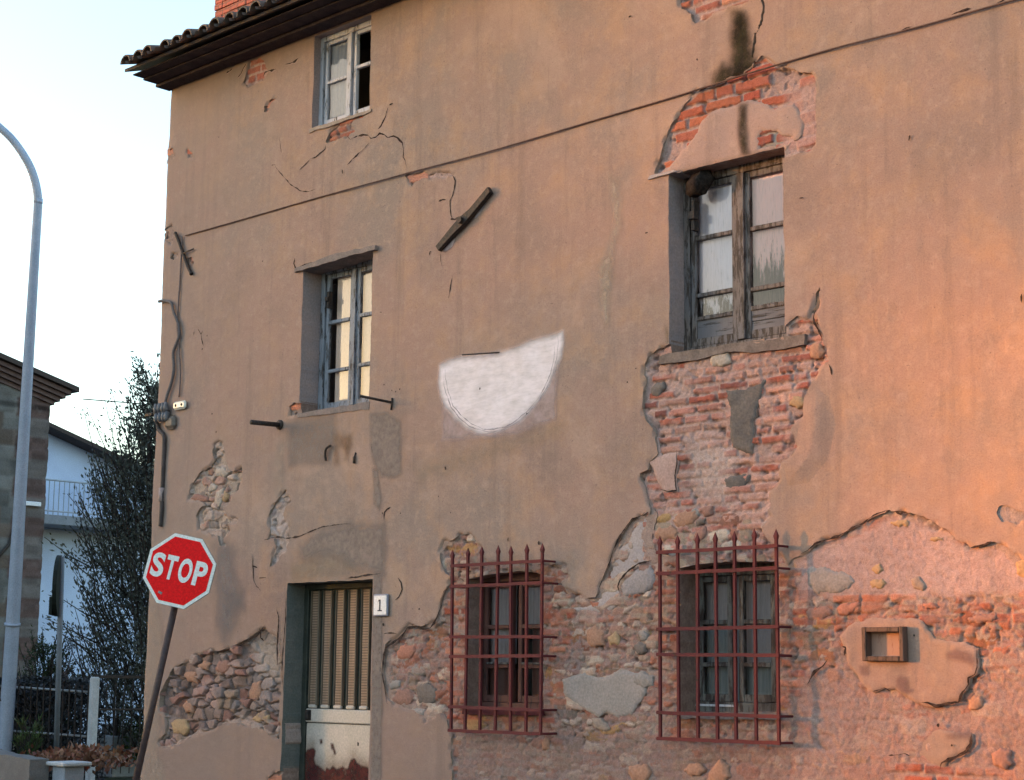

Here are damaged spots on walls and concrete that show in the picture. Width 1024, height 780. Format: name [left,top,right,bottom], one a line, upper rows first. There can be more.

spalling [245,58,268,87]
spalling [681,0,748,23]
water stain [715,13,754,83]
crack [274,108,407,192]
spalling [657,56,817,178]
water stain [739,106,747,153]
crack [439,176,457,220]
spalling [190,431,243,546]
spalling [269,492,291,566]
spalling [384,290,1024,780]
spalling [160,629,301,747]